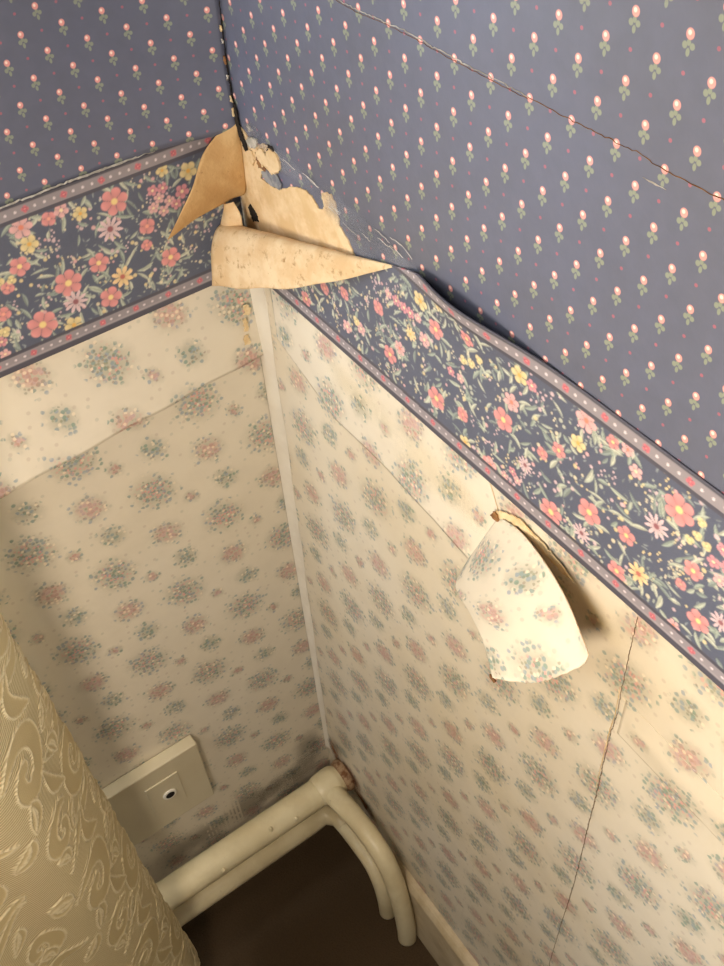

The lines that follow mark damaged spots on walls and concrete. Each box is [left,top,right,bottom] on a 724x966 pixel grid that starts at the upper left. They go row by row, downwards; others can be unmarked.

crack [219,0,235,117]
crack [336,0,724,200]
peeling [168,124,394,289]
corrosion [330,741,374,820]
crack [549,617,638,966]